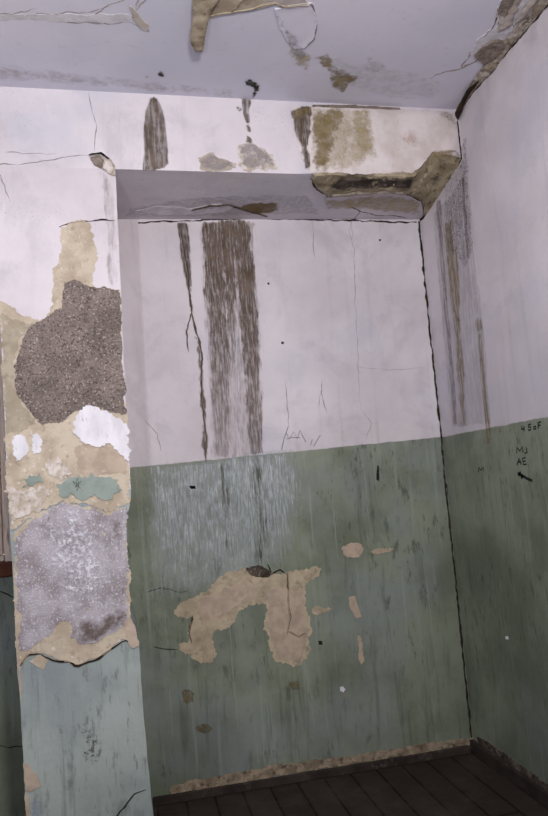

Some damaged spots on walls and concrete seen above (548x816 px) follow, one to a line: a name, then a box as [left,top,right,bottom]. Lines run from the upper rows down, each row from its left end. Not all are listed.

crack [0,0,149,31]
peeling [190,0,318,58]
peeling [456,0,548,109]
leakage [143,97,168,170]
leakage [291,106,371,168]
spalling [311,154,461,216]
crack [59,219,115,227]
leakage [202,219,262,438]
peeling [0,220,139,700]
peeling [174,564,331,667]
peeling [19,763,41,816]
crack [116,789,146,816]